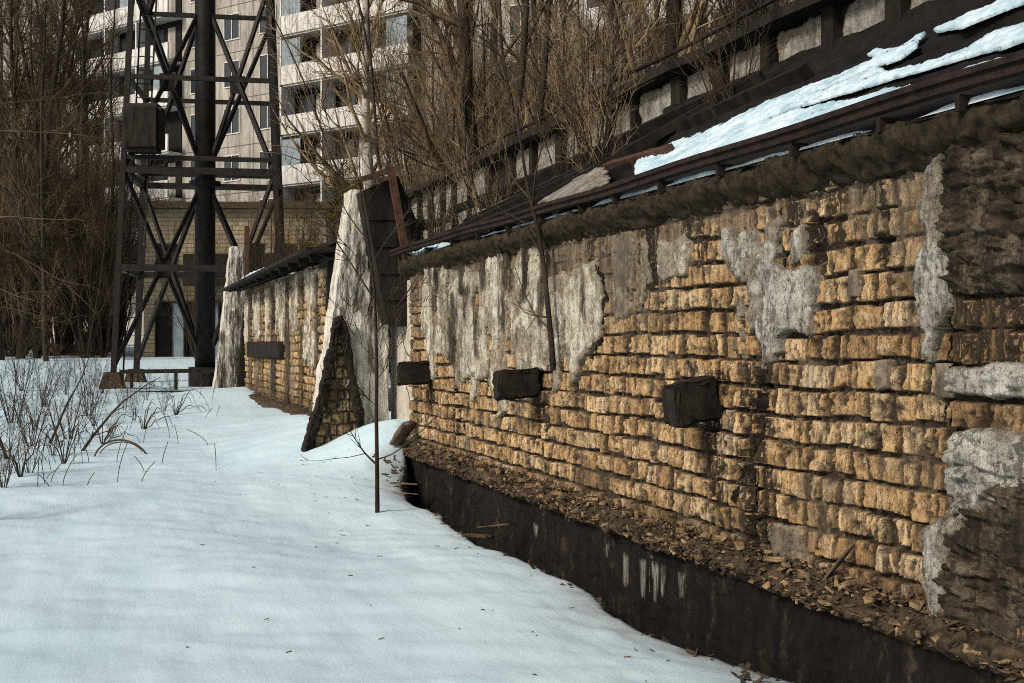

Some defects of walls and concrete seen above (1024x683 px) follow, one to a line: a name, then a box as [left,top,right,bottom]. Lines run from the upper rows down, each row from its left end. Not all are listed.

flaking render [243,266,319,370]
water stain [428,249,507,365]
water stain [520,241,545,324]
flaking render [420,230,697,416]
water stain [580,235,596,319]
water stain [682,214,707,268]
flaking render [720,209,832,369]
water stain [786,195,805,238]
water stain [828,177,891,249]
spalling [873,231,896,264]
water stain [533,369,553,471]
peeling [767,523,811,565]